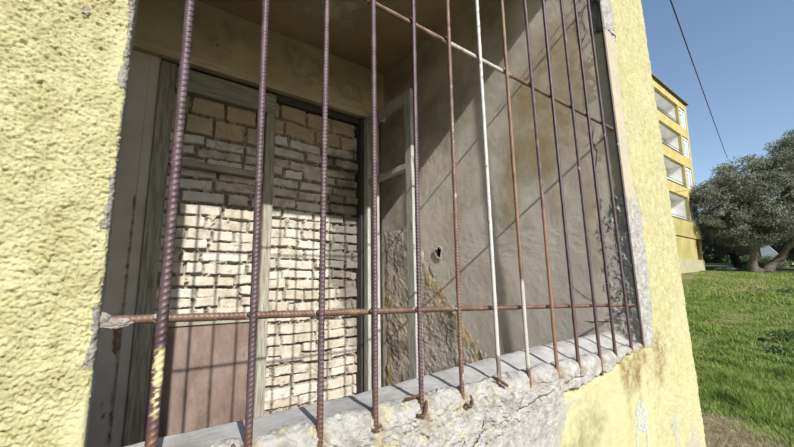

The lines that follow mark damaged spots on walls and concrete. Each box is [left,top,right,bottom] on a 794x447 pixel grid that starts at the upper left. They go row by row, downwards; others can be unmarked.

spalling [117,0,137,89]
spalling [99,174,116,231]
flaking render [206,0,654,447]
corrosion [112,328,121,354]
crack [462,371,587,447]